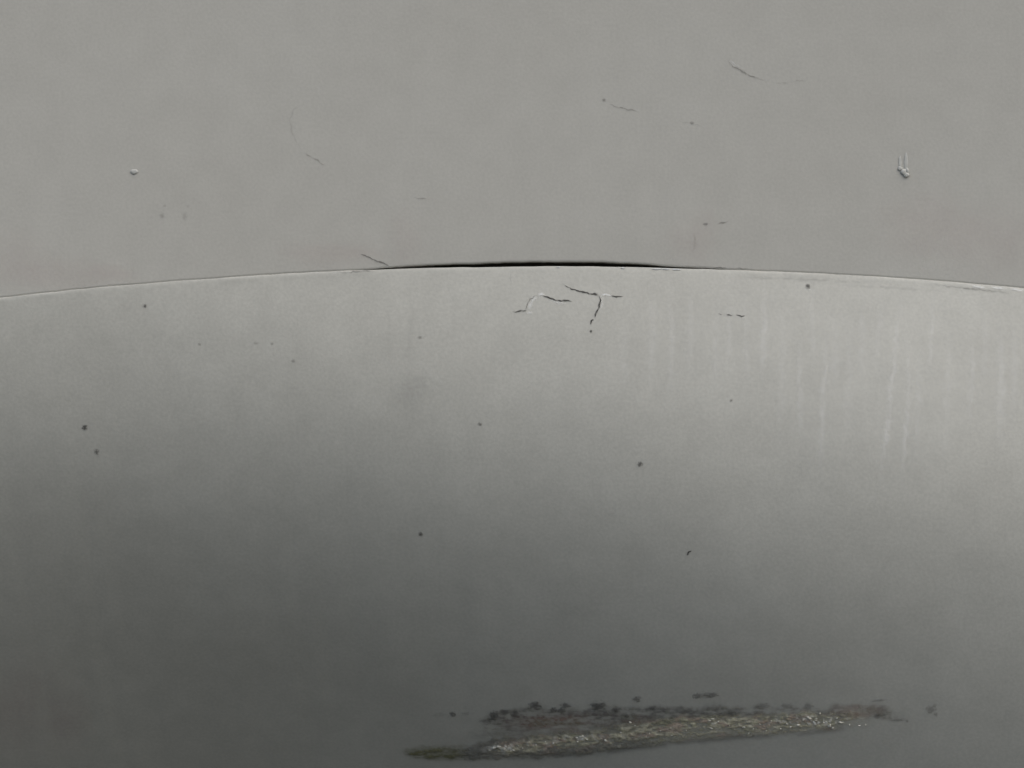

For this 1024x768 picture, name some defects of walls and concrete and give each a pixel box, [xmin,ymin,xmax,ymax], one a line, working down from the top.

crack [355,255,684,332]
spalling [409,703,866,759]